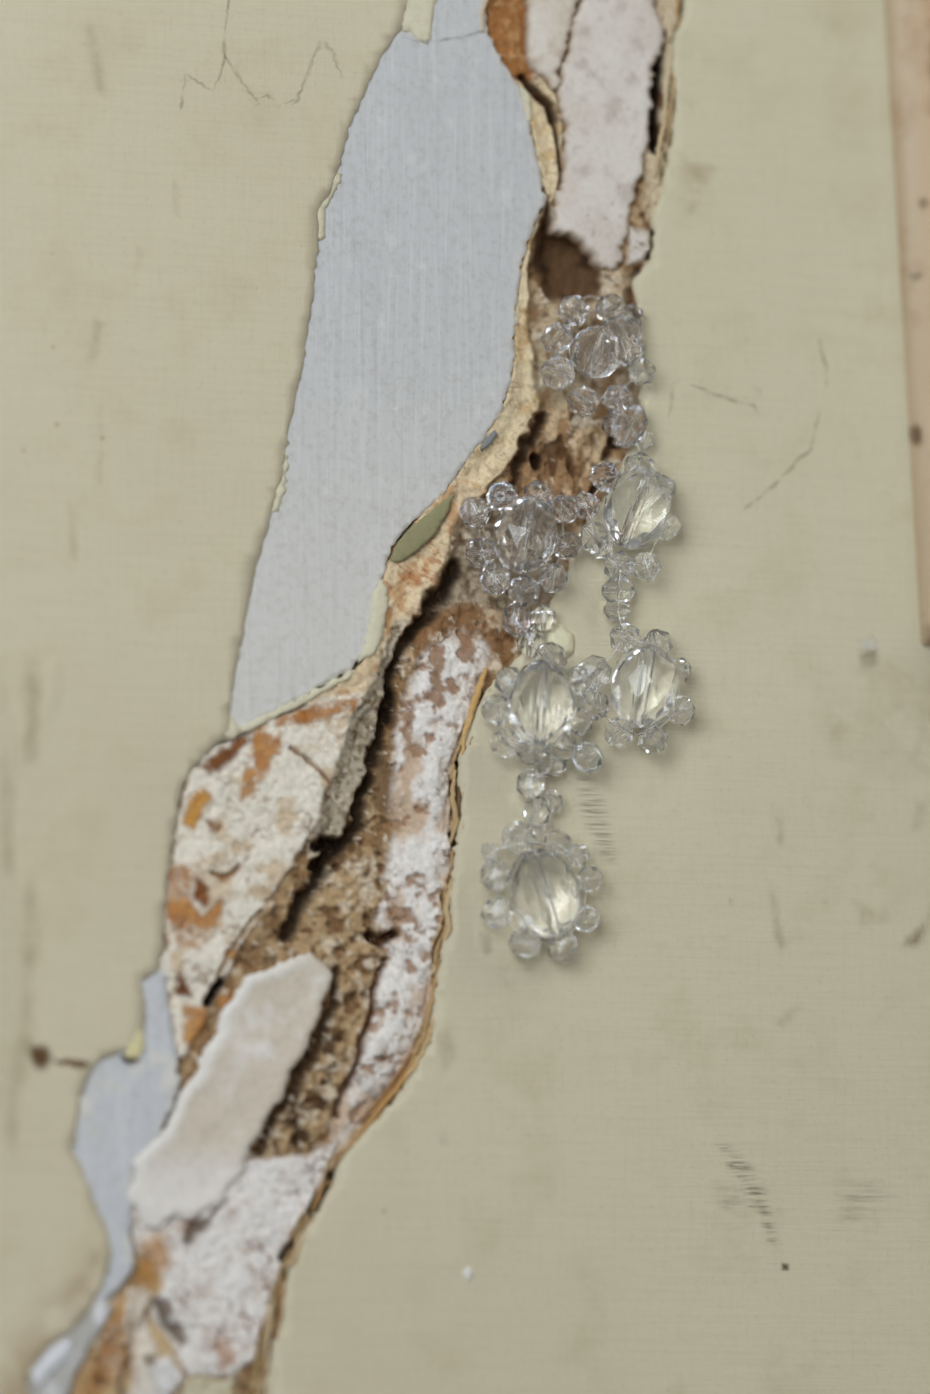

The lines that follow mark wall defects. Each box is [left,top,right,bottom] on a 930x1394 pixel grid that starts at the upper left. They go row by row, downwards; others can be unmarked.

crack [54,1053,137,1068]
peeling [25,0,547,1394]
crack [161,0,683,1394]
peeling [545,624,574,657]